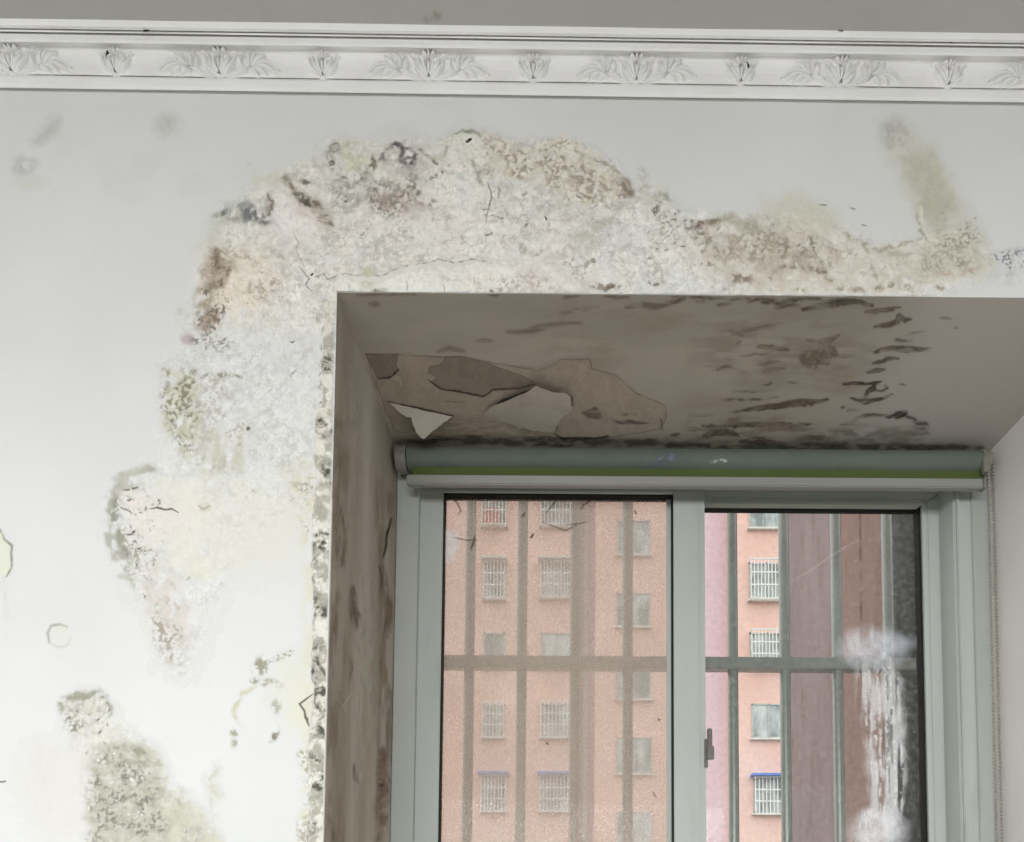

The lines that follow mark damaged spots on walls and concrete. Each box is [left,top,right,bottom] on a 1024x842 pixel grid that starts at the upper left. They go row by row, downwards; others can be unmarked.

peeling [366,354,667,440]
leakage [99,110,1024,706]
flaking render [279,257,525,842]
leakage [6,684,230,842]
leakage [229,643,310,750]
leakage [378,713,391,803]